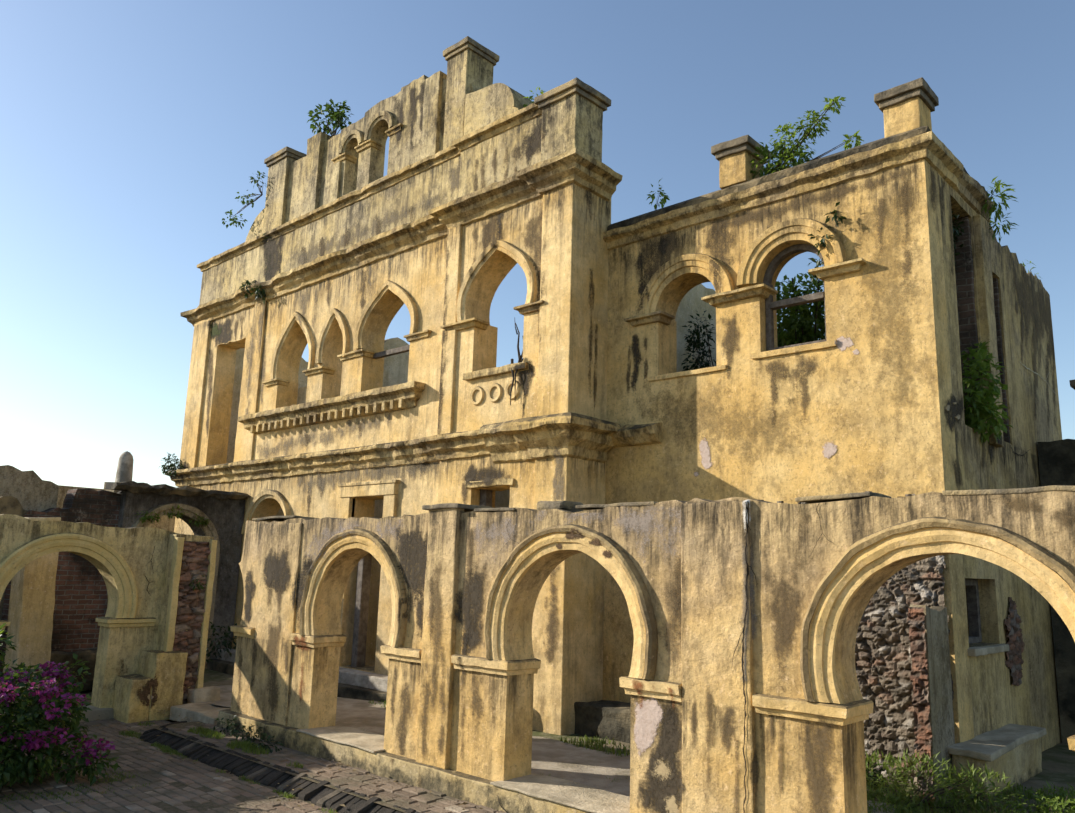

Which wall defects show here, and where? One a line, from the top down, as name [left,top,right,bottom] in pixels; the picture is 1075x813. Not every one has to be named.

damp [634,230,681,321]
damp [706,167,916,400]
damp [626,335,647,391]
flaking render [694,438,712,476]
damp [642,356,816,455]
flaking render [835,336,859,355]
damp [237,522,358,711]
damp [376,519,514,761]
damp [543,566,559,662]
crack [731,502,758,813]
damp [771,570,800,690]
flaking render [634,697,685,813]